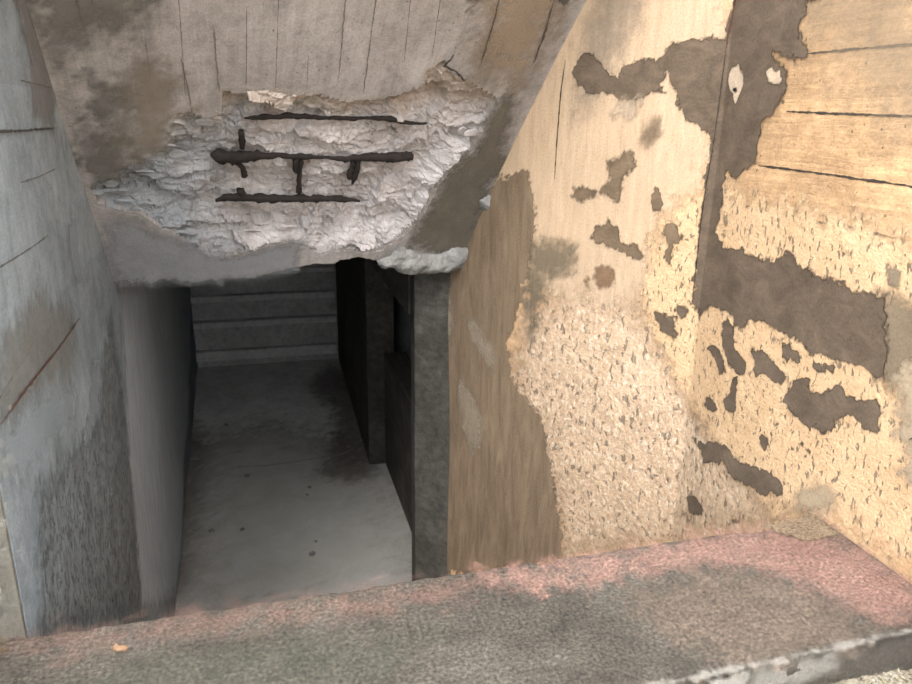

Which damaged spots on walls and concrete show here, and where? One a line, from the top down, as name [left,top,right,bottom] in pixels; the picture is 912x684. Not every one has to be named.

water stain [16,0,160,127]
crack [181,59,192,110]
crack [212,26,220,92]
crack [338,0,346,79]
crack [364,0,377,88]
crack [443,1,499,82]
crack [0,126,54,134]
water stain [72,82,144,182]
spalling [86,59,503,259]
corrosion [210,112,427,204]
peeling [571,0,912,563]